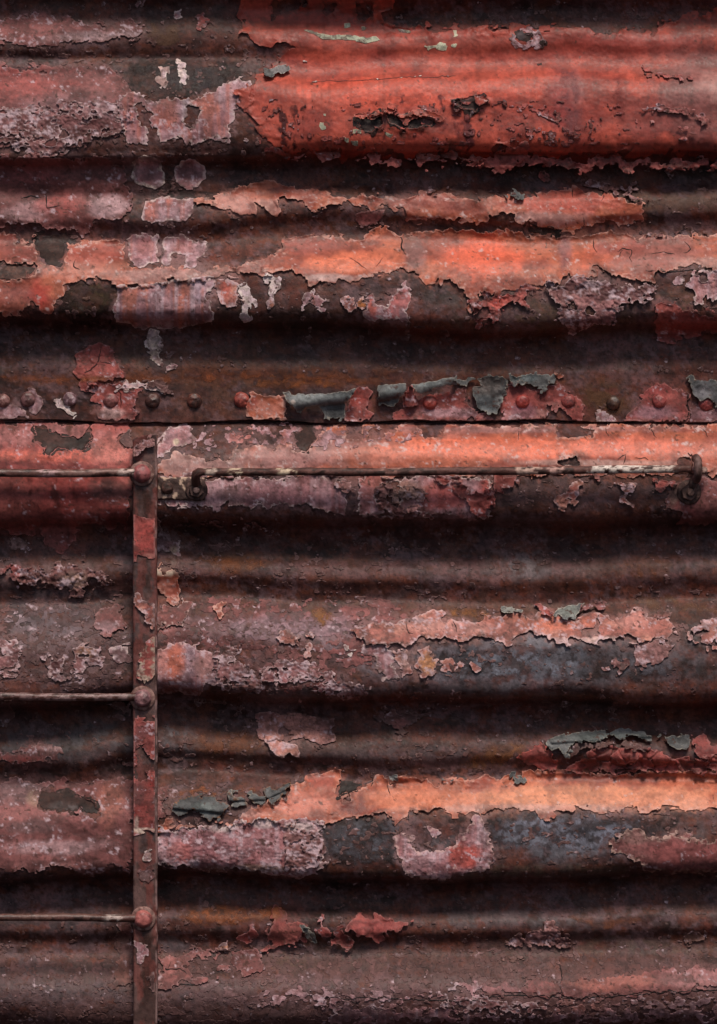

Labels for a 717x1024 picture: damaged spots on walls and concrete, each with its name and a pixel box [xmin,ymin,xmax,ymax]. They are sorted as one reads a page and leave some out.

peeling [0,0,717,691]
corrosion [180,906,283,925]
peeling [0,546,717,1024]